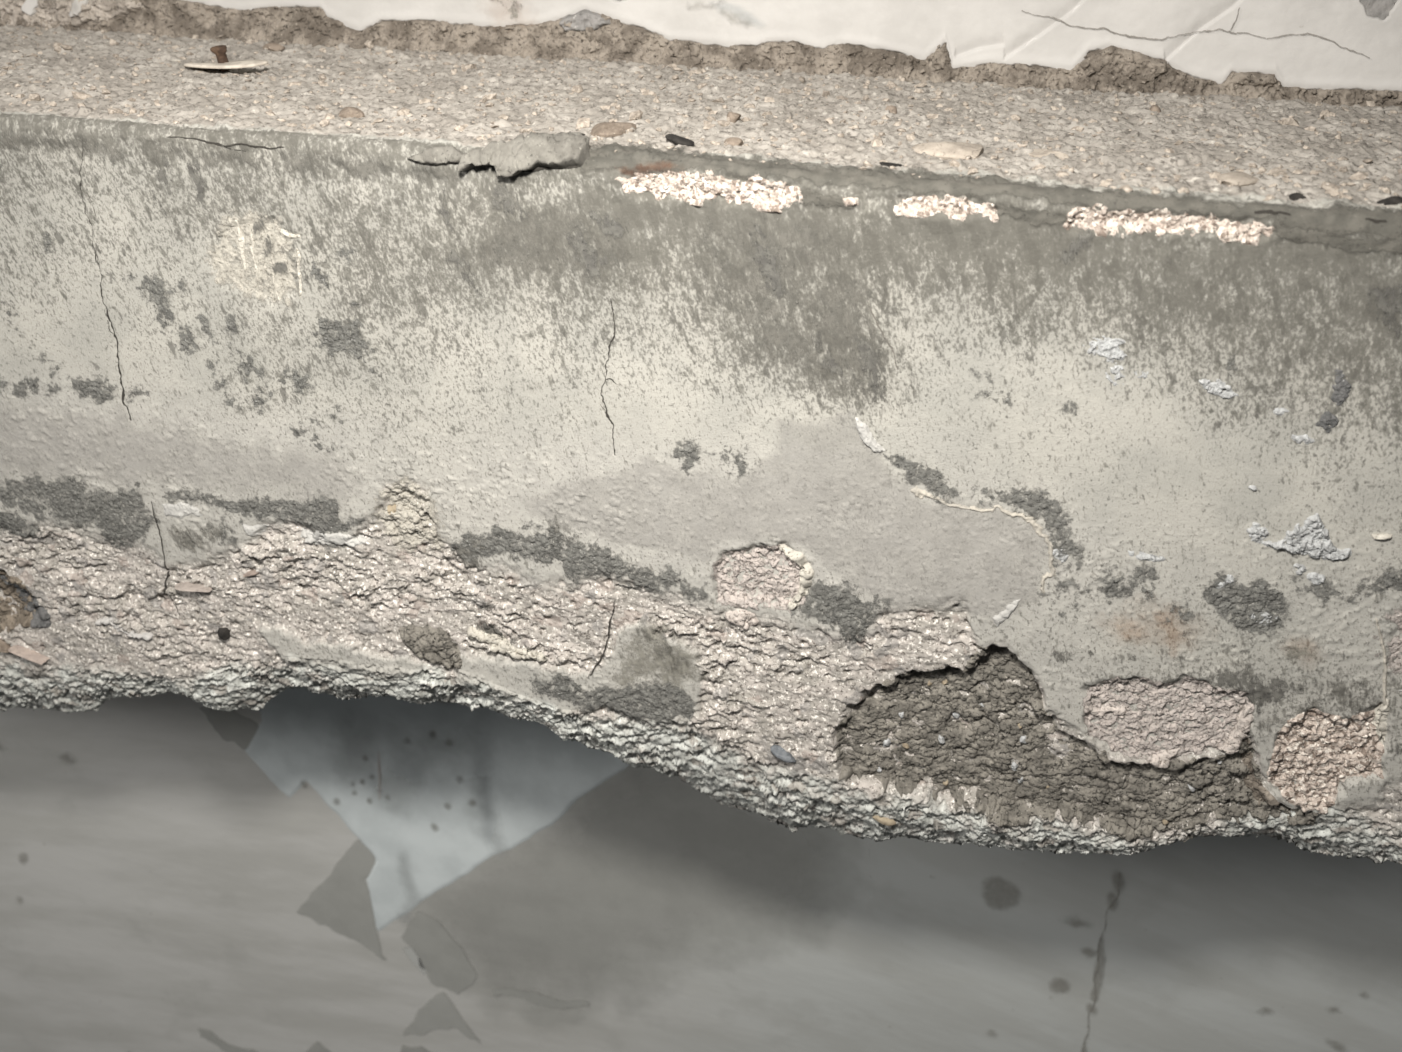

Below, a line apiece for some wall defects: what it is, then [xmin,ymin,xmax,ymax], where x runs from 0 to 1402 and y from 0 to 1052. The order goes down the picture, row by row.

spalling [0,0,145,29]
peeling [1360,0,1397,20]
spalling [1079,45,1168,76]
spalling [1230,72,1277,86]
crack [79,143,131,420]
water stain [580,142,1402,406]
crack [600,301,616,455]
peeling [301,476,445,558]
spalling [0,569,51,633]
spalling [712,544,814,630]
spalling [398,623,462,669]
spalling [836,644,1390,843]